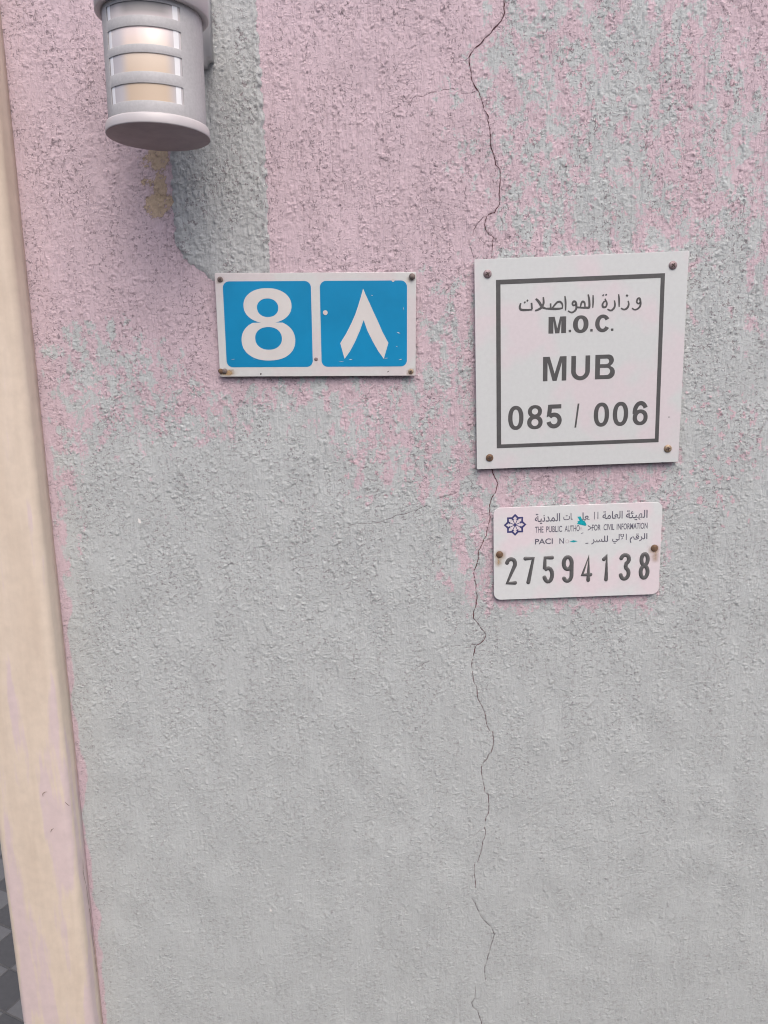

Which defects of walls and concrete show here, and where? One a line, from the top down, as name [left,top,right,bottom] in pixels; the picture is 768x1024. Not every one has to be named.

crack [394,3,505,257]
crack [453,470,498,1024]